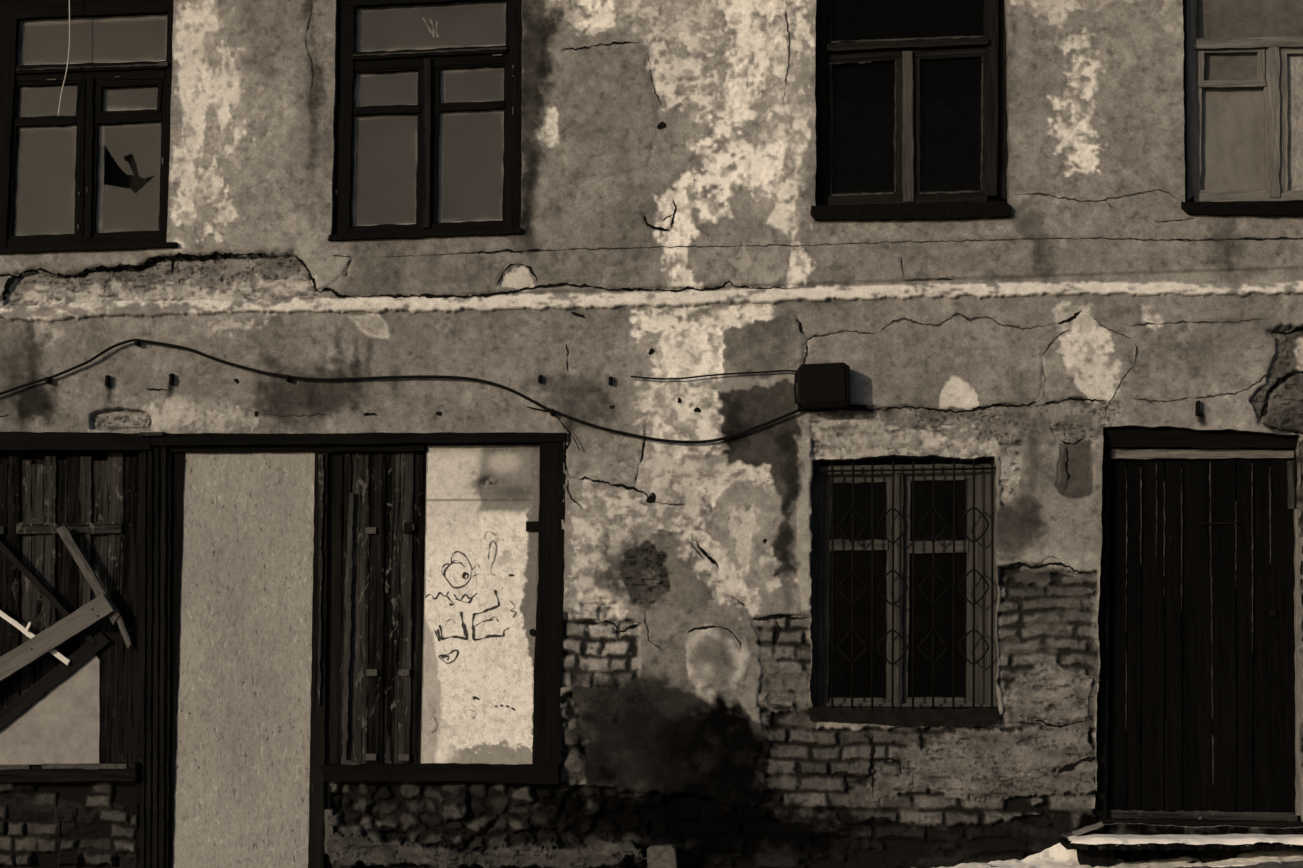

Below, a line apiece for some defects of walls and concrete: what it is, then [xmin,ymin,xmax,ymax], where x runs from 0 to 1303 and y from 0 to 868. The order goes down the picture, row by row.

crack [782,10,790,97]
peeling [1158,0,1183,34]
peeling [0,0,353,355]
crack [561,423,683,509]
crack [0,189,1303,490]
flaking render [326,0,1141,868]
leakage [716,379,802,579]
peeling [1141,305,1165,331]
spalling [1250,325,1303,435]